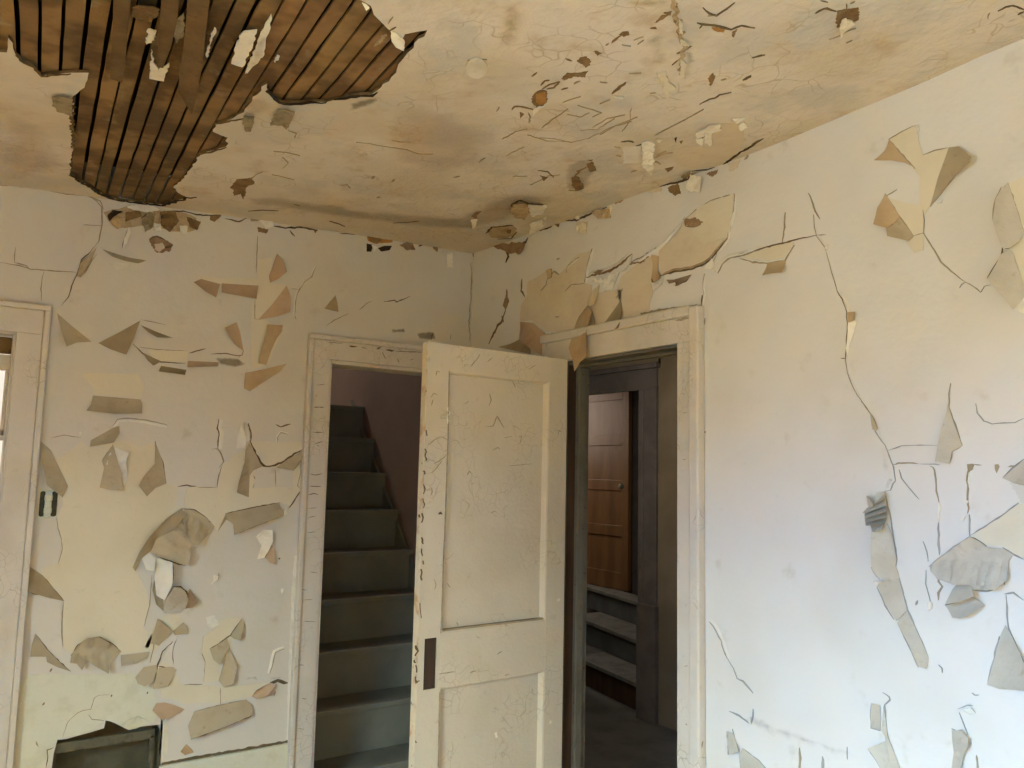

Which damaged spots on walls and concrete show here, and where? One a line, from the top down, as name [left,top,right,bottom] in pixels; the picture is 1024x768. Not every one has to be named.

crack [697,2,755,37]
crack [0,191,146,302]
spalling [0,0,420,253]
crack [175,210,356,236]
peeling [244,254,293,391]
crack [502,96,637,185]
peeling [520,194,734,332]
crack [640,138,764,325]
crack [808,193,941,555]
peeling [873,125,971,253]
peeling [13,419,303,768]
peeling [925,503,1024,618]